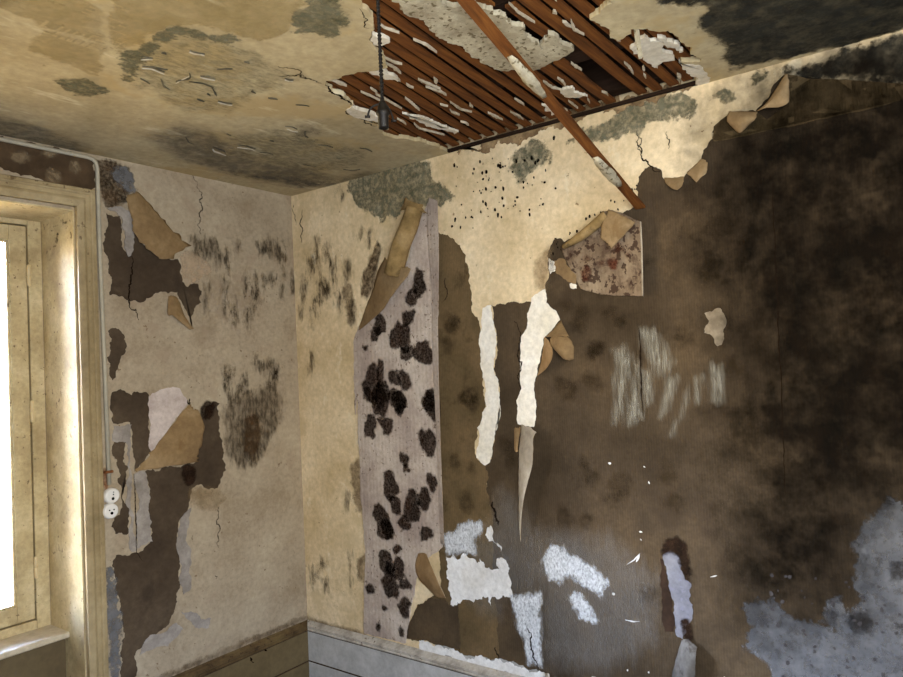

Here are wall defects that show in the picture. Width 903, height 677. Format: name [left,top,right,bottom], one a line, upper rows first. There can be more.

spalling [326,0,564,155]
spalling [475,0,710,122]
water stain [341,136,557,229]
crack [636,132,660,172]
peeling [103,213,202,326]
peeling [107,328,127,380]
water stain [362,268,433,440]
water stain [658,0,903,677]
water stain [418,388,436,457]
peeling [110,389,226,677]
water stain [365,452,438,637]
peeling [660,537,693,640]